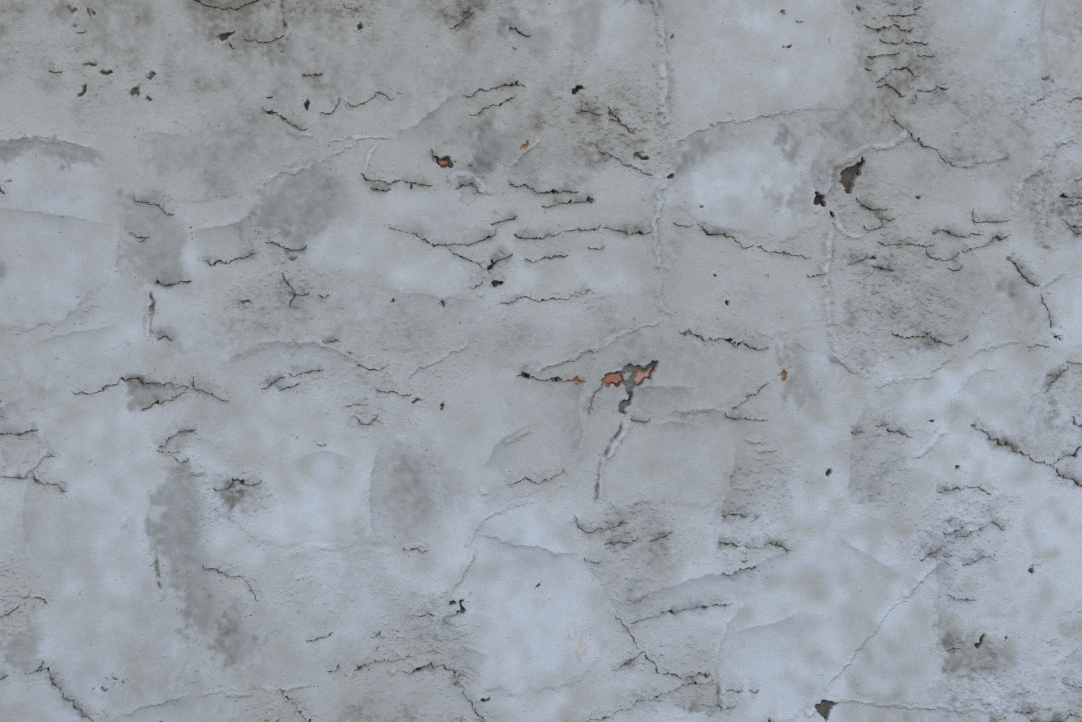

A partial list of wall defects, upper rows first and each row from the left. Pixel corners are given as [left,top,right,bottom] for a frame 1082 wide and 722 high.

peeling [854,0,949,104]
peeling [460,74,530,119]
peeling [359,170,435,195]
peeling [388,148,652,294]
spalling [814,172,1012,380]
flaking render [601,359,655,388]
spalling [1041,354,1082,435]
peeling [936,482,995,499]
crack [972,418,1082,491]
spalling [569,495,675,567]
spalling [915,515,1010,570]